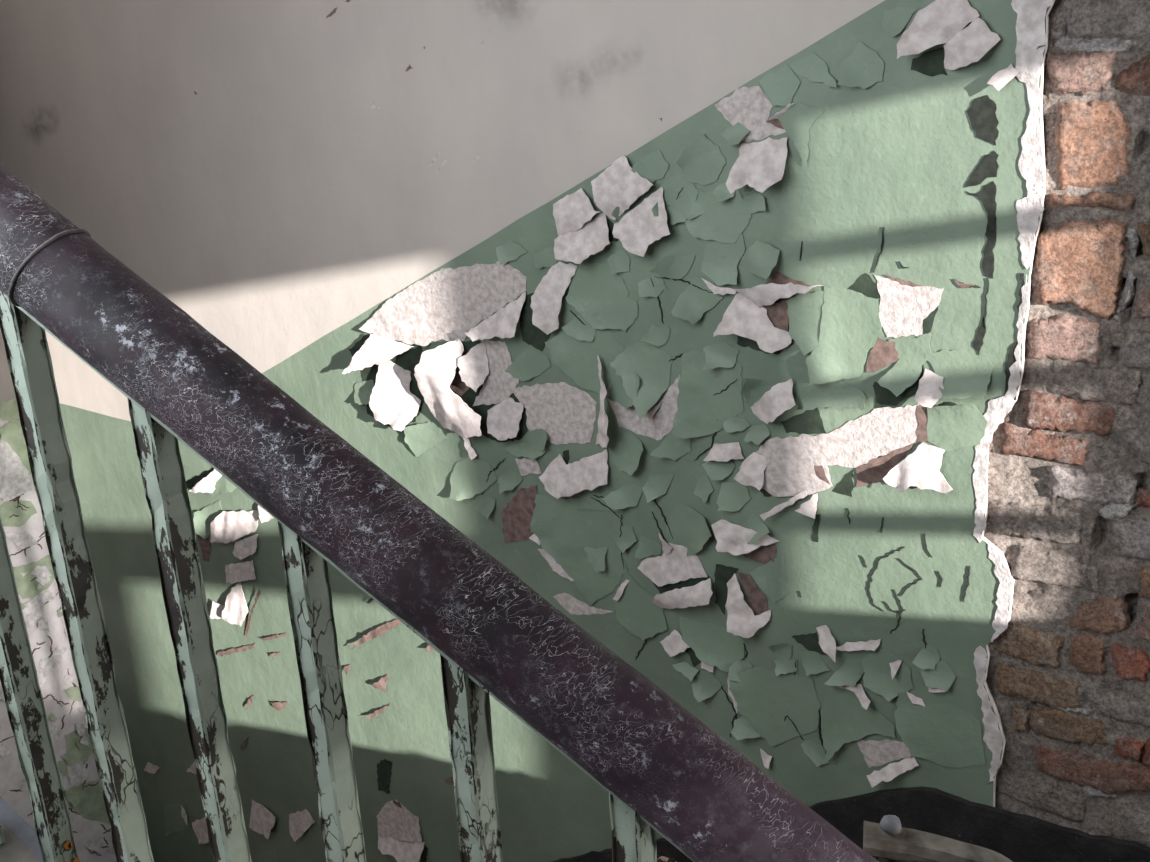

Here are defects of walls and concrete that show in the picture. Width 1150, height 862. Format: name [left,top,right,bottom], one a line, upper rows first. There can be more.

peeling [342,0,1052,787]
peeling [186,468,287,659]
crack [861,517,970,649]
peeling [144,762,160,774]
peeling [164,803,209,844]
peeling [249,799,315,862]
peeling [376,759,428,862]